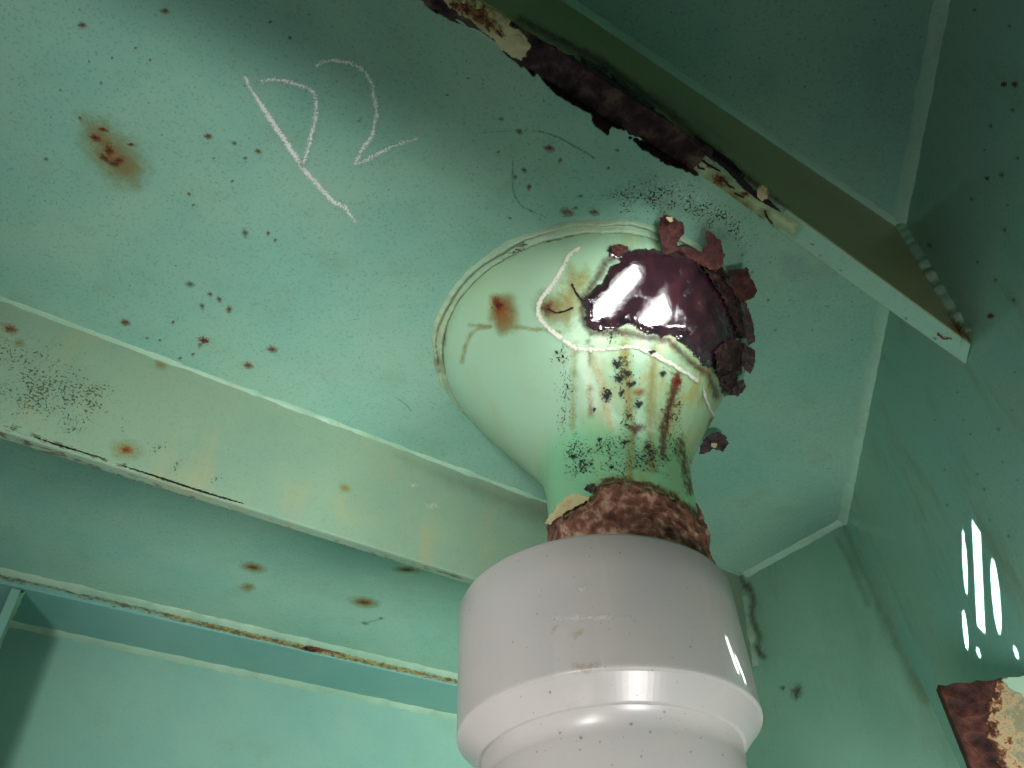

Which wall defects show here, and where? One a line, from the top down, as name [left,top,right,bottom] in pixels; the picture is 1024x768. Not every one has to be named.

corrosion [90,127,138,176]
peeling [519,17,799,235]
corrosion [421,0,757,564]
corrosion [301,645,346,655]